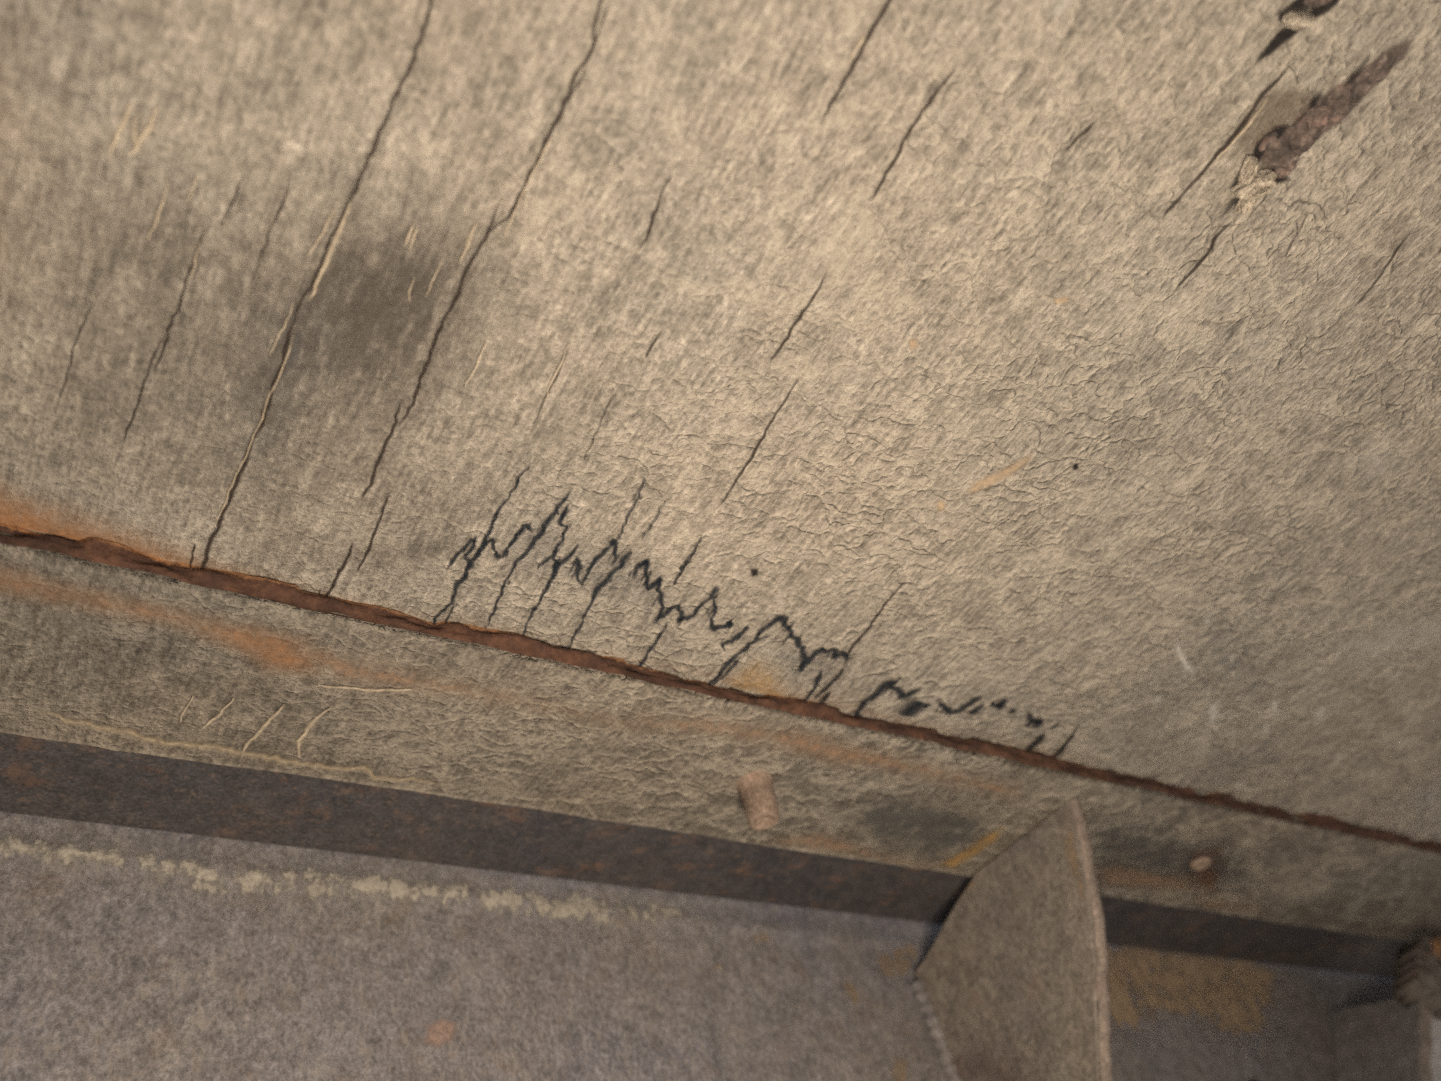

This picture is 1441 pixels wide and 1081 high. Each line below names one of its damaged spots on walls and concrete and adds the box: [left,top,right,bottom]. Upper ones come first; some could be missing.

spalling [1258,0,1339,62]
spalling [1222,44,1410,217]
crack [190,0,433,570]
crack [319,0,608,597]
crack [722,276,826,504]
corrosion [0,506,1441,853]
crack [434,467,1078,757]